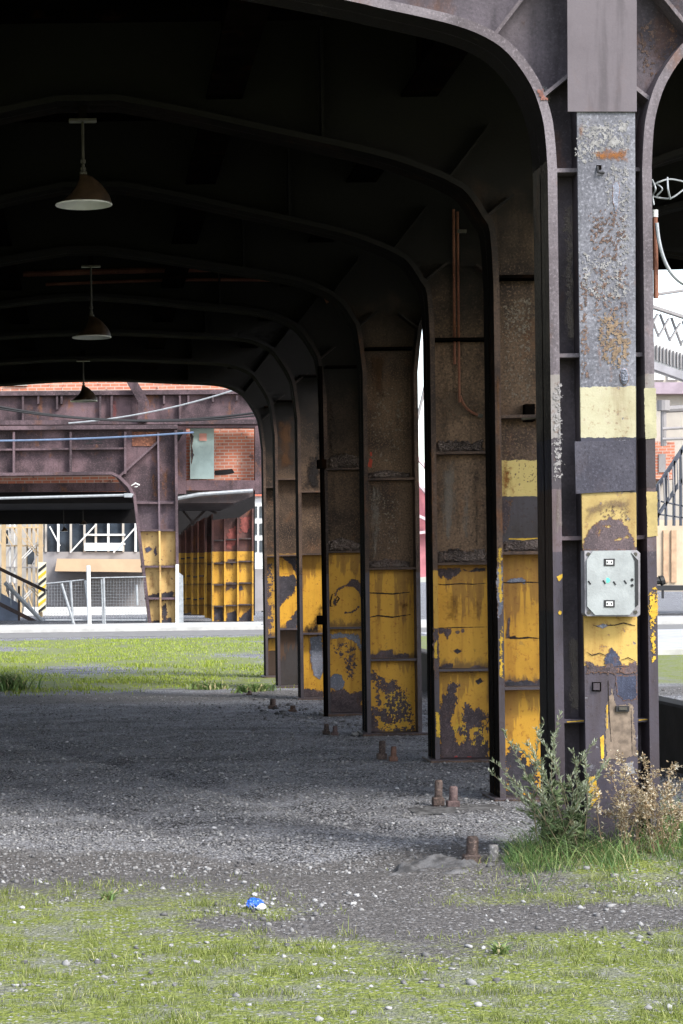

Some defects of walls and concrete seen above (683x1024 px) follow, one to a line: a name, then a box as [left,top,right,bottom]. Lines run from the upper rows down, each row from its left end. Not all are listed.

corrosion [596,150,626,160]
peeling [575,118,631,378]
corrosion [589,209,631,369]
peeling [551,383,565,478]
peeling [583,517,636,551]
peeling [214,556,415,731]
peeling [432,548,540,757]
peeling [586,648,638,775]